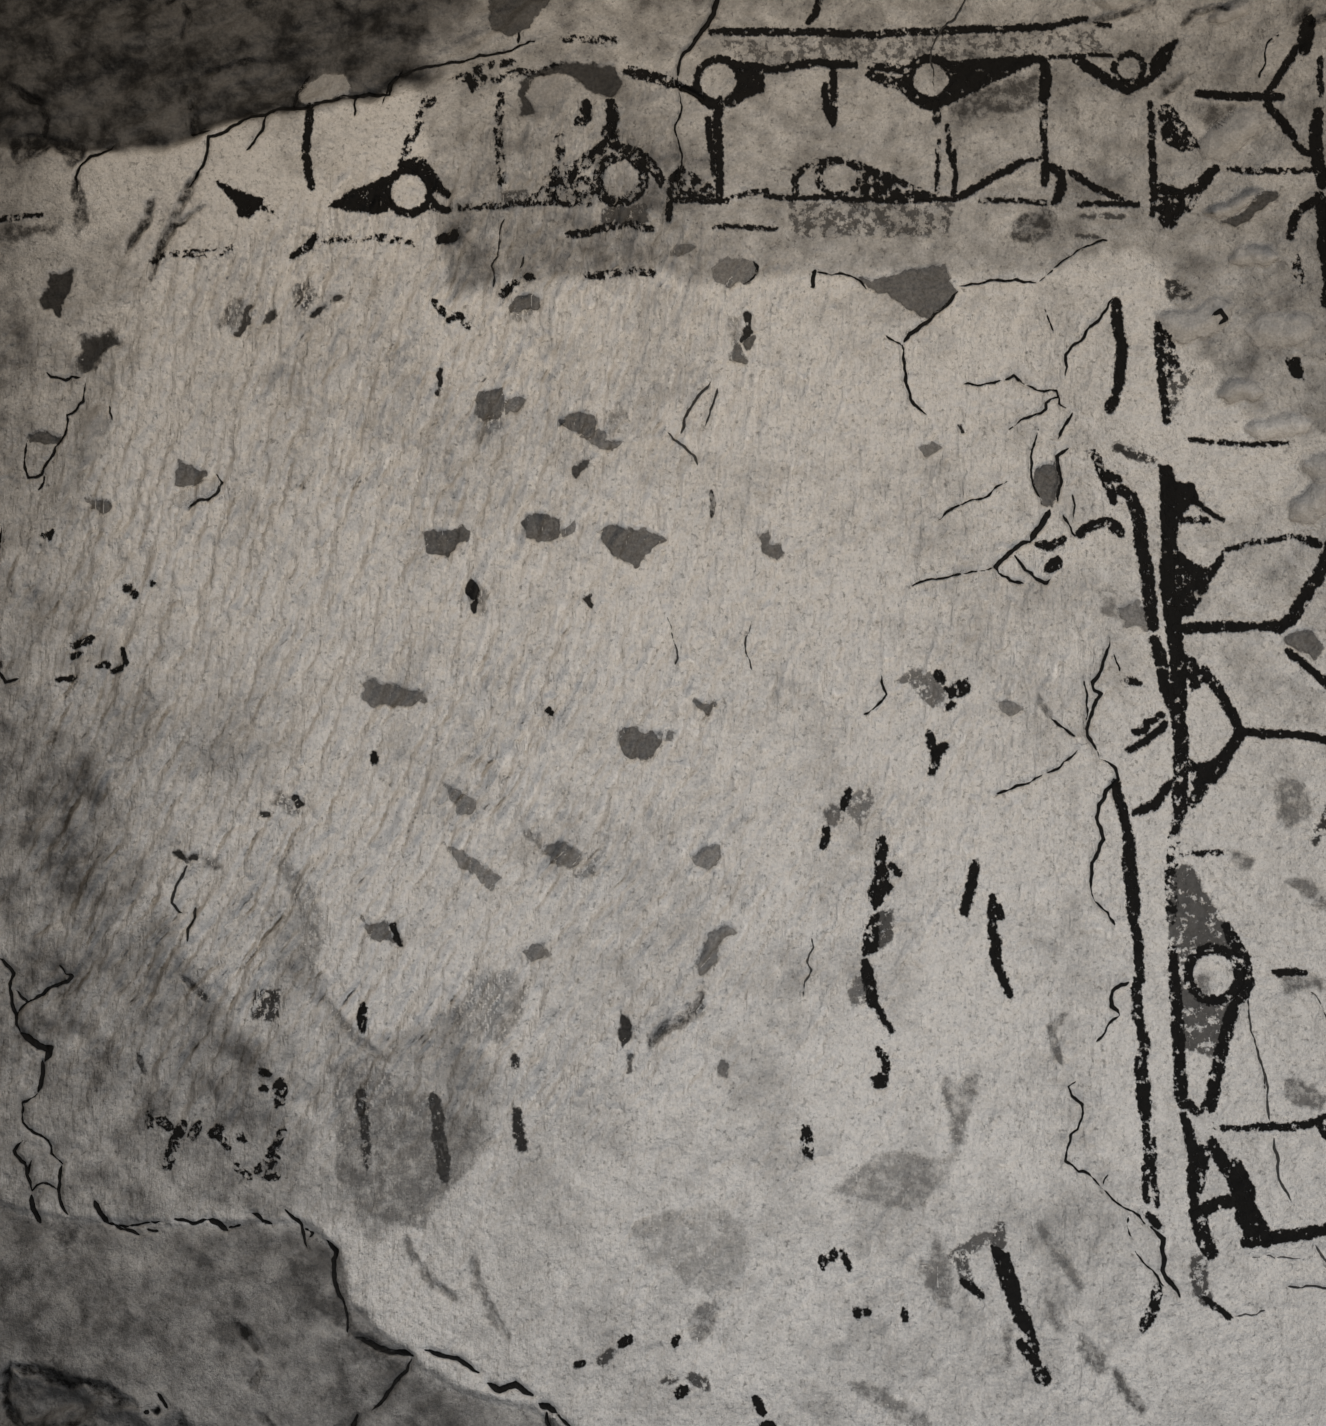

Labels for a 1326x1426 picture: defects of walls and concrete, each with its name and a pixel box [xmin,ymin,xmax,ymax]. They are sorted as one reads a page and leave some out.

spalling [488,0,549,36]
crack [929,0,965,86]
spalling [518,61,622,116]
crack [674,0,720,189]
spalling [10,134,86,166]
spalling [811,264,956,319]
crack [886,239,1113,586]
crack [0,958,571,1426]
crack [1237,1245,1326,1317]